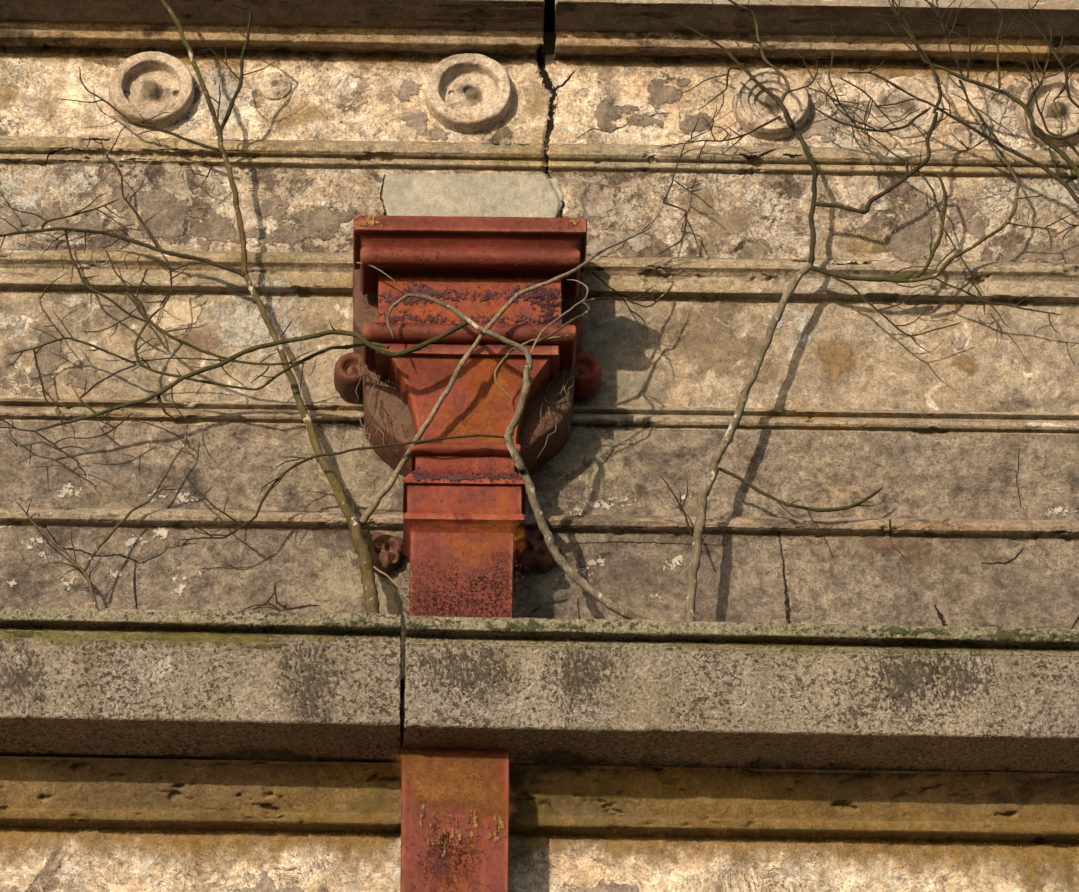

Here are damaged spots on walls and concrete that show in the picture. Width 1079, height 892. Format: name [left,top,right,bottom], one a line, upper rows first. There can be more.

crack [536,46,670,218]
peeling [594,71,713,134]
crack [45,525,196,609]
crack [274,583,319,610]
crack [778,532,791,623]
rust [403,748,507,814]
peeling [232,871,302,892]